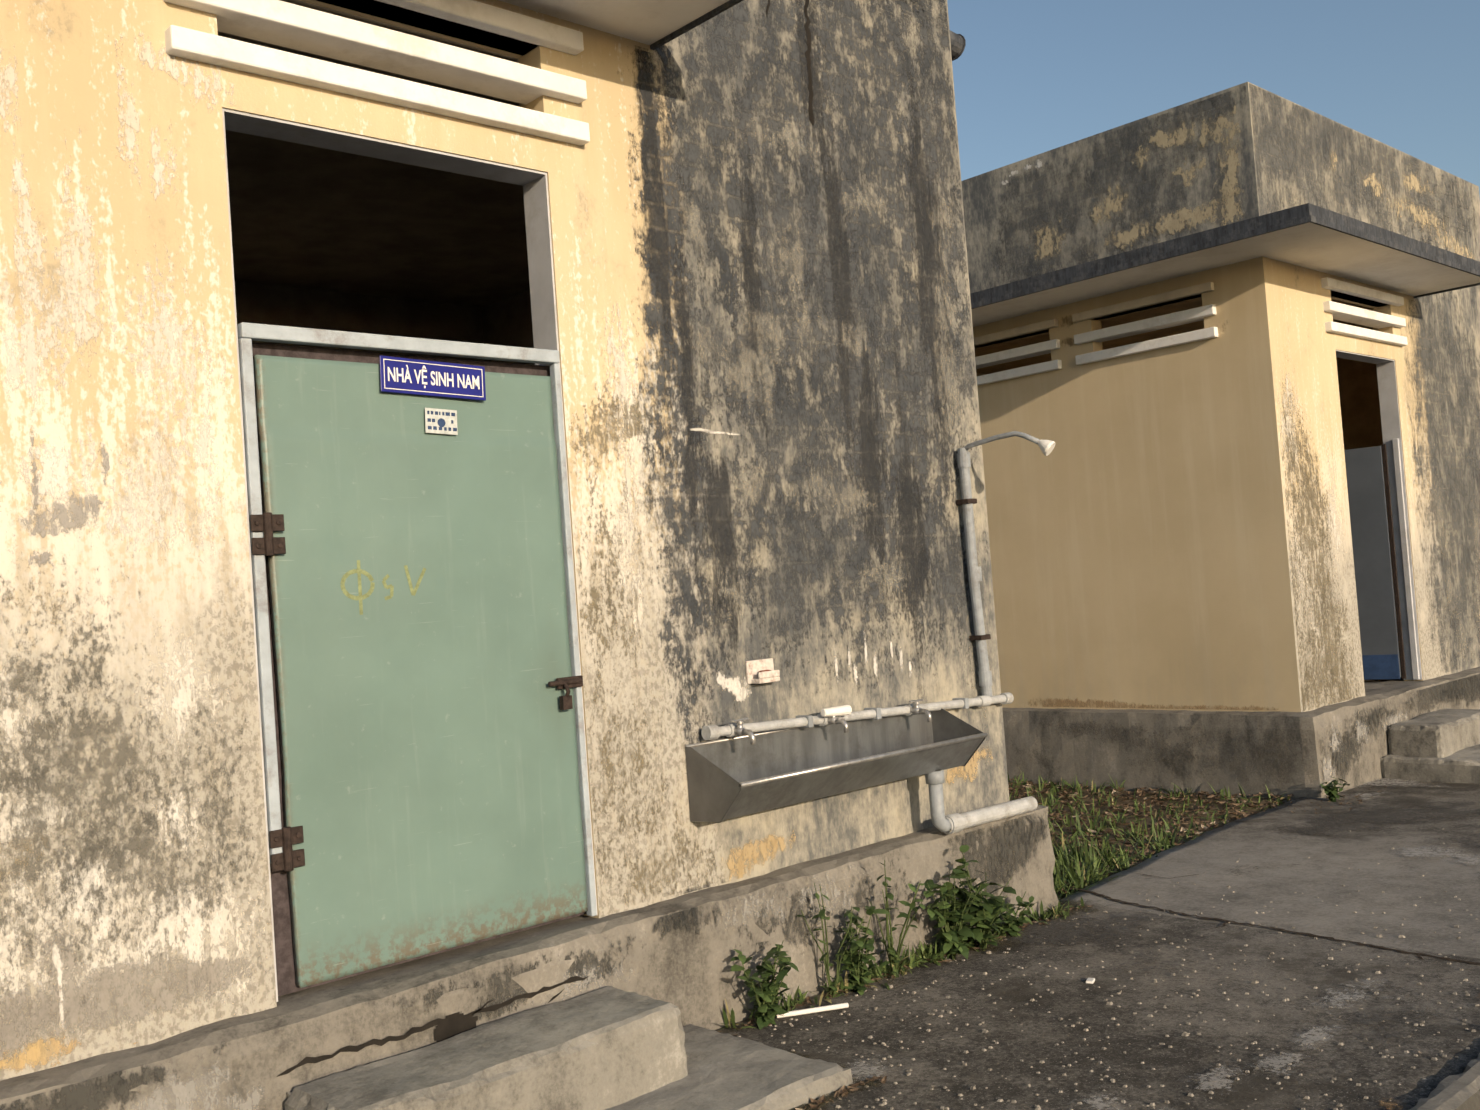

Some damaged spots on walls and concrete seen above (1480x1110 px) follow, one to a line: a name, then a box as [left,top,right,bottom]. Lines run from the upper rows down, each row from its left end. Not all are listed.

water stain [992,85,1476,287]
peeling [0,32,234,567]
water stain [571,0,980,954]
water stain [1280,287,1480,783]
peeling [135,626,230,749]
peeling [0,660,264,1005]
water stain [0,576,270,1061]
water stain [951,811,1049,902]
water stain [0,1044,262,1110]
crack [277,976,589,1077]
water stain [393,935,643,1019]